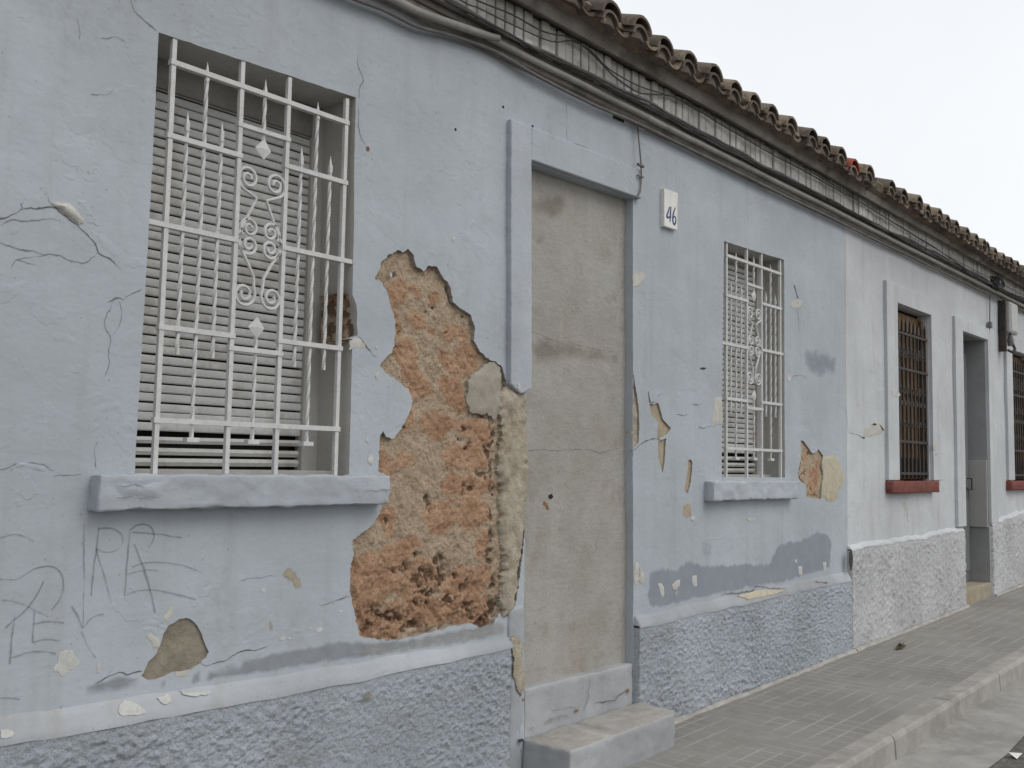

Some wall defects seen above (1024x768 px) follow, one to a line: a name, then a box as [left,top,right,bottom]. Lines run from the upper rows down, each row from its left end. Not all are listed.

crack [0,198,121,269]
crack [104,289,142,377]
flaking render [319,251,529,640]
peeling [648,389,669,469]
peeling [683,460,695,521]
flaking render [798,441,845,502]
peeling [738,589,785,600]
flaking render [141,606,207,680]
peeling [510,635,525,696]